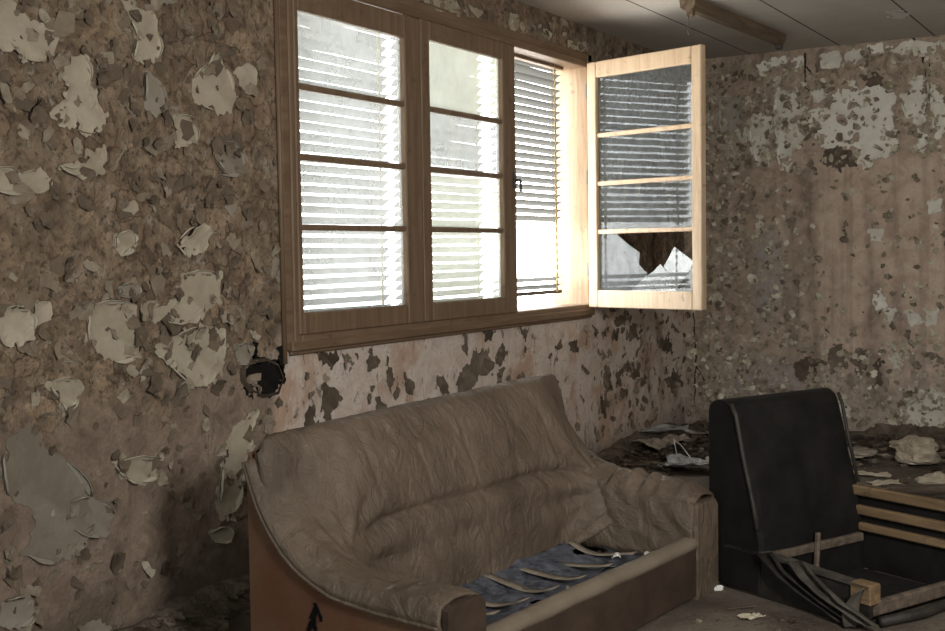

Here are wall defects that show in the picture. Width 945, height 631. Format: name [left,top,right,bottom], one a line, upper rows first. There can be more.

peeling [503,6,654,62]
peeling [581,39,945,443]
peeling [0,0,286,631]
spalling [294,348,415,427]
spalling [436,330,526,395]
spalling [548,339,579,361]